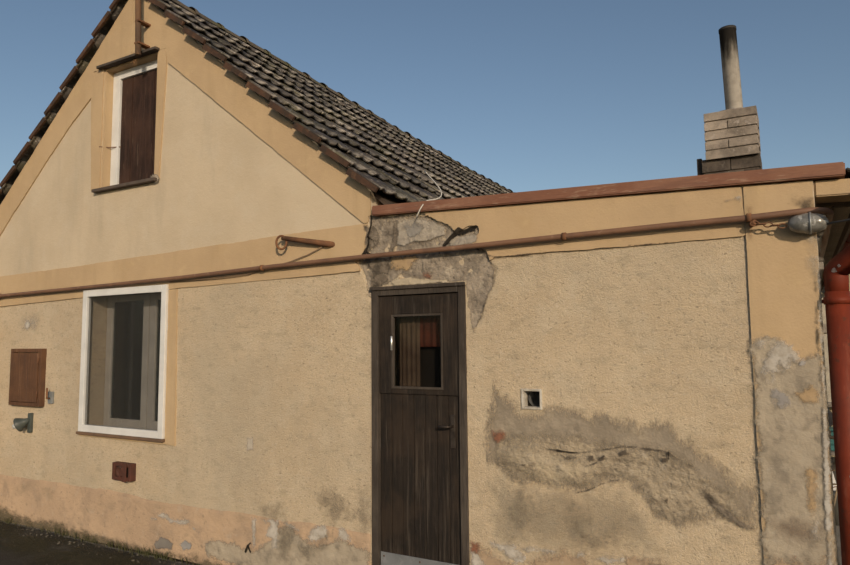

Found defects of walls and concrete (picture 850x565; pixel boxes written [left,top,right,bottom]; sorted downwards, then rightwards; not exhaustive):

flaking render [359,215,495,328]
flaking render [470,304,837,565]
flaking render [205,519,371,565]